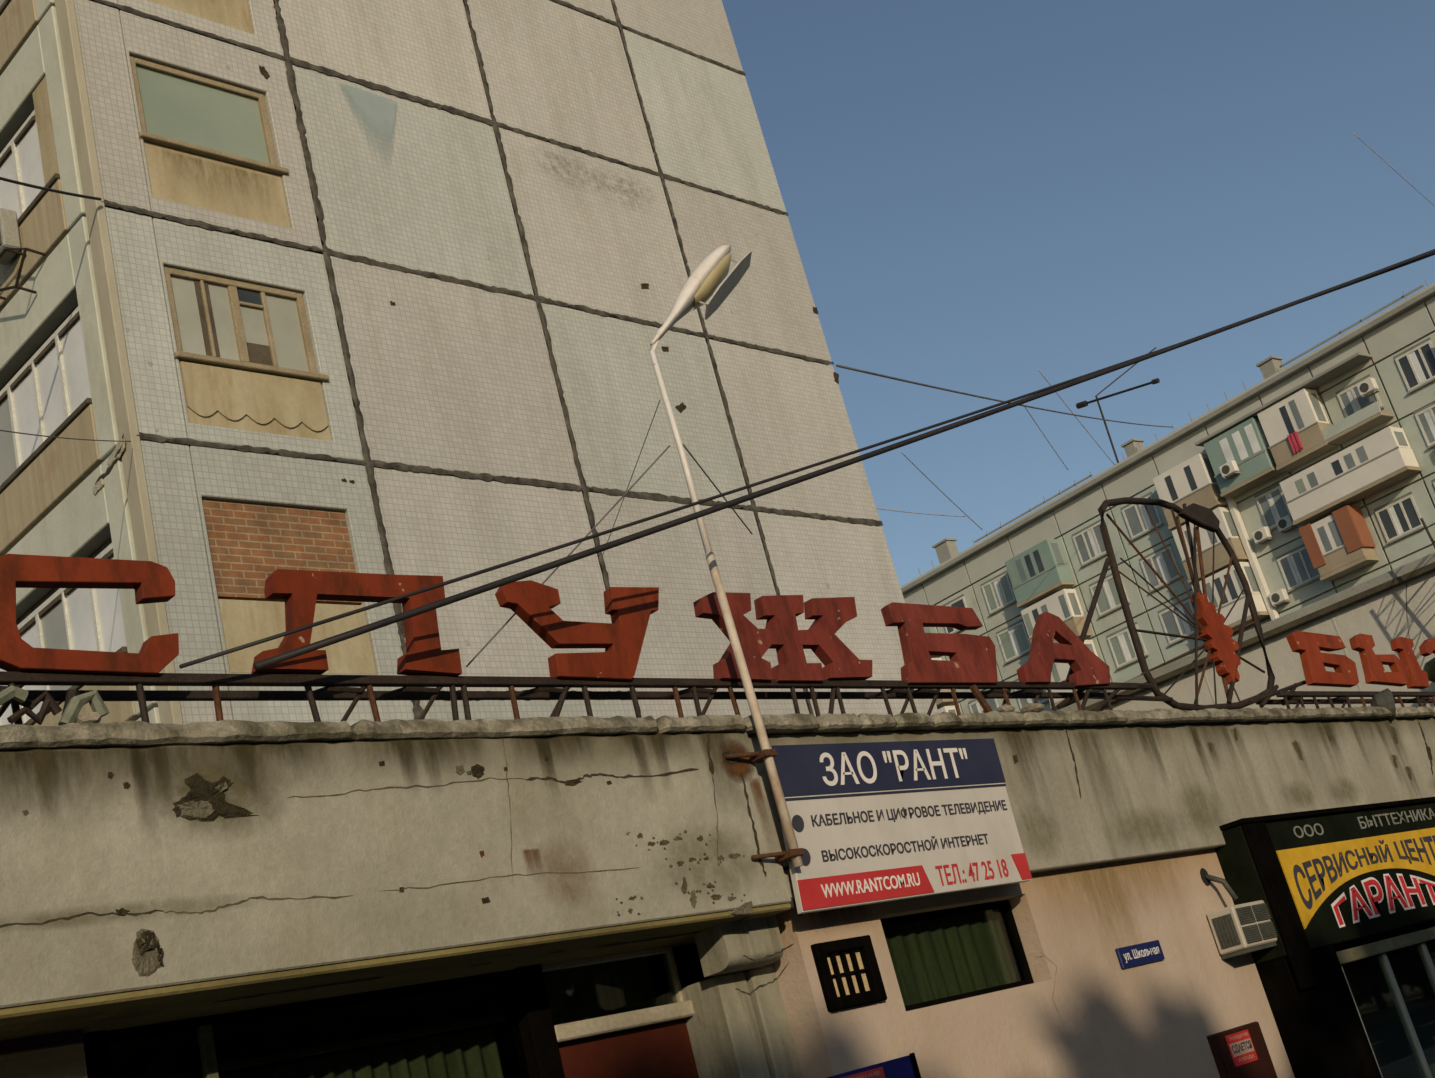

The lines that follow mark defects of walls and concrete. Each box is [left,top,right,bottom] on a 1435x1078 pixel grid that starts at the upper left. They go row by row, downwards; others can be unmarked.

spalling [172,766,259,822]
crack [0,732,803,962]
peeling [626,830,746,909]
spalling [132,929,163,977]